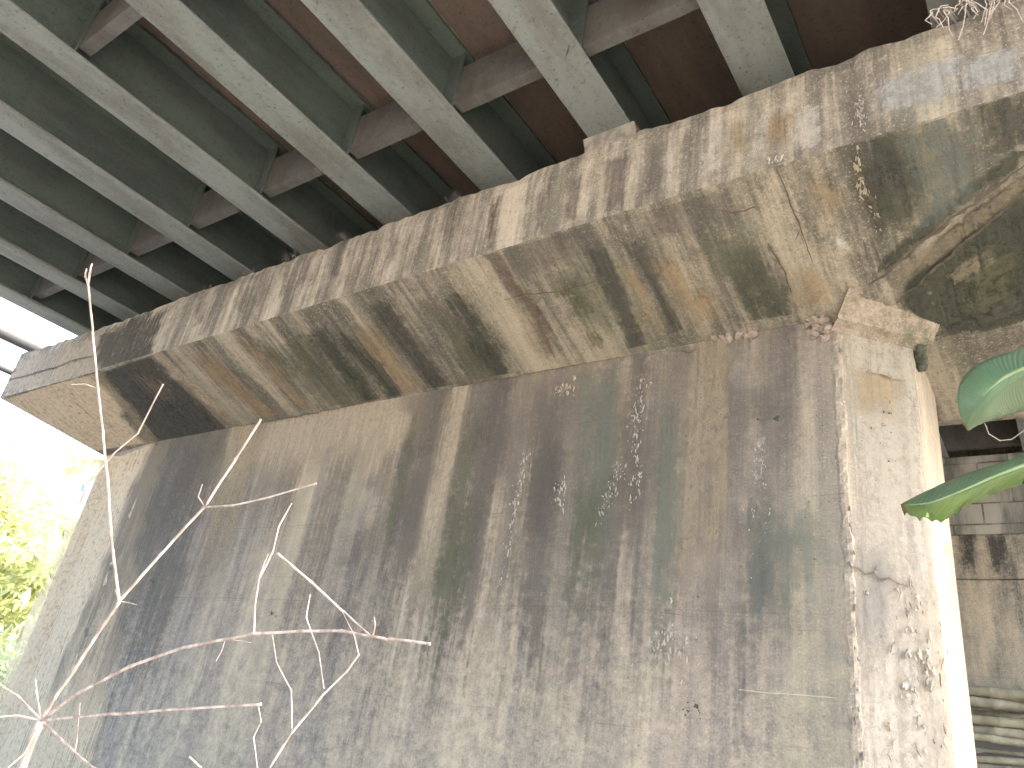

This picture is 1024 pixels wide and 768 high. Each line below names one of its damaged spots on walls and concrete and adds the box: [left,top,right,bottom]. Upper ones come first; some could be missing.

crack [776,168,813,263]
damp [864,97,1024,336]
damp [445,293,512,376]
damp [591,251,646,348]
damp [625,242,682,334]
damp [723,247,792,320]
crack [767,243,792,293]
damp [0,303,473,768]
crack [850,565,908,601]
damp [842,334,951,768]
peeling [880,576,948,767]